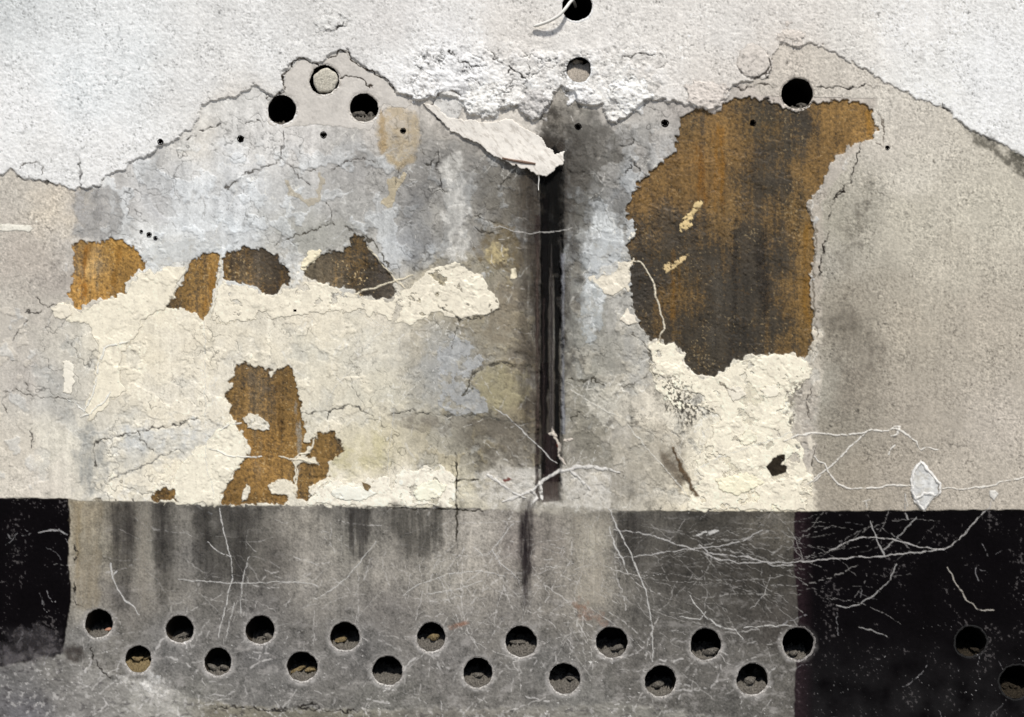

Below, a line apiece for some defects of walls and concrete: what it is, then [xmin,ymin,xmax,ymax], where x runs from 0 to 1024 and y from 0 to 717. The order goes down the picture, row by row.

hole [779,76,815,111]
crack [224,131,284,190]
corrosion [166,245,291,320]
crack [276,157,389,267]
corrosion [303,234,396,300]
peeling [212,249,499,325]
water stain [535,147,590,501]
corrosion [625,96,879,377]
crack [94,418,197,478]
peeling [164,415,249,507]
corrosion [220,361,344,506]
peeling [648,341,813,512]